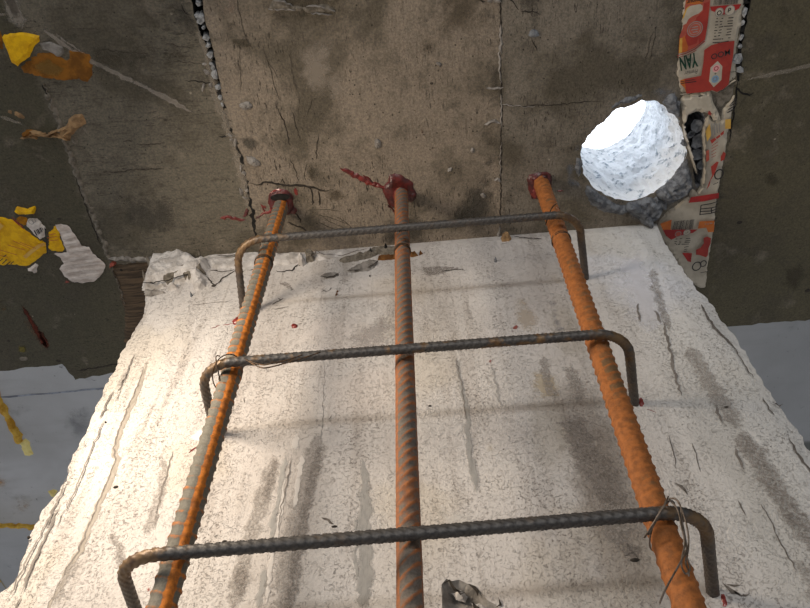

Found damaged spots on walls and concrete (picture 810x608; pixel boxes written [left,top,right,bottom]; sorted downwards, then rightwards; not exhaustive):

crack [64,0,351,236]
crack [457,0,599,237]
spalling [568,91,705,228]
crack [729,0,753,141]
spalling [166,200,288,547]
spalling [321,187,421,528]
water stain [242,434,326,541]
spalling [145,559,190,608]
water stain [226,554,251,608]
water stain [256,550,303,608]
water stain [353,544,374,607]
spalling [396,540,424,608]